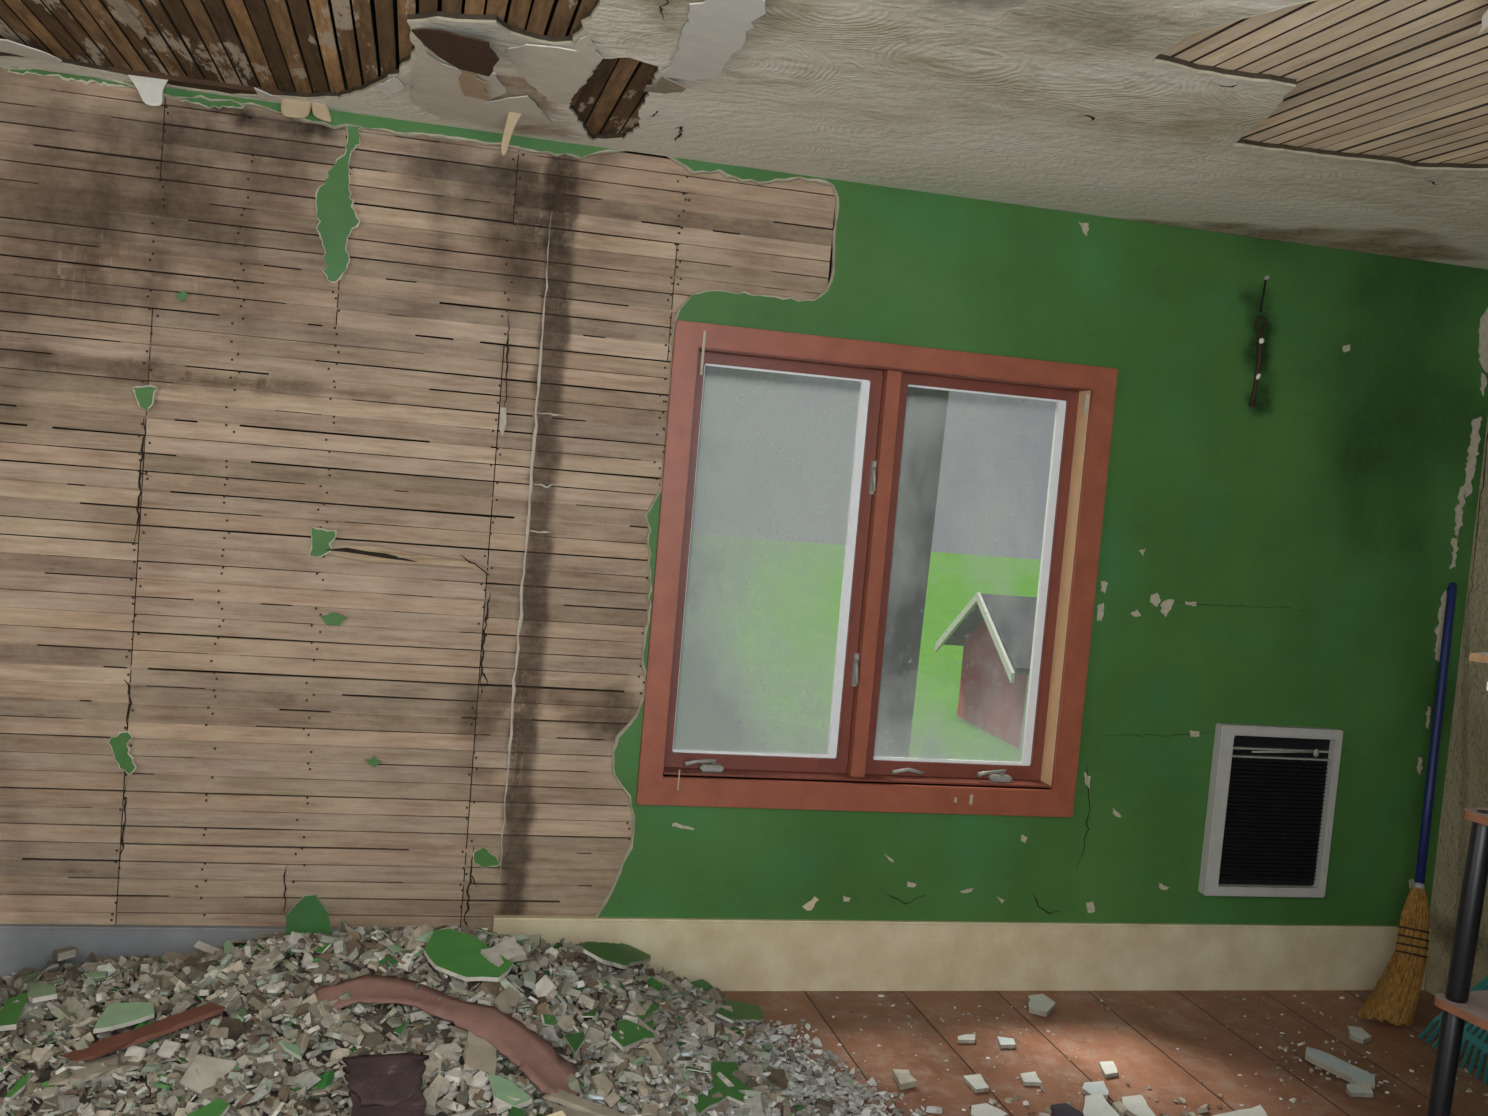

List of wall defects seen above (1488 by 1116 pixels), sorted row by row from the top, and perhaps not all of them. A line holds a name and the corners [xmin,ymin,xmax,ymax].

flaking render [1152,0,1488,171]
spalling [1478,308,1488,396]
crack [134,419,152,543]
flaking render [0,0,839,982]
damp [479,155,577,915]
spalling [1449,416,1488,606]
spalling [1434,591,1447,662]
crack [123,679,132,730]
crack [119,787,127,860]